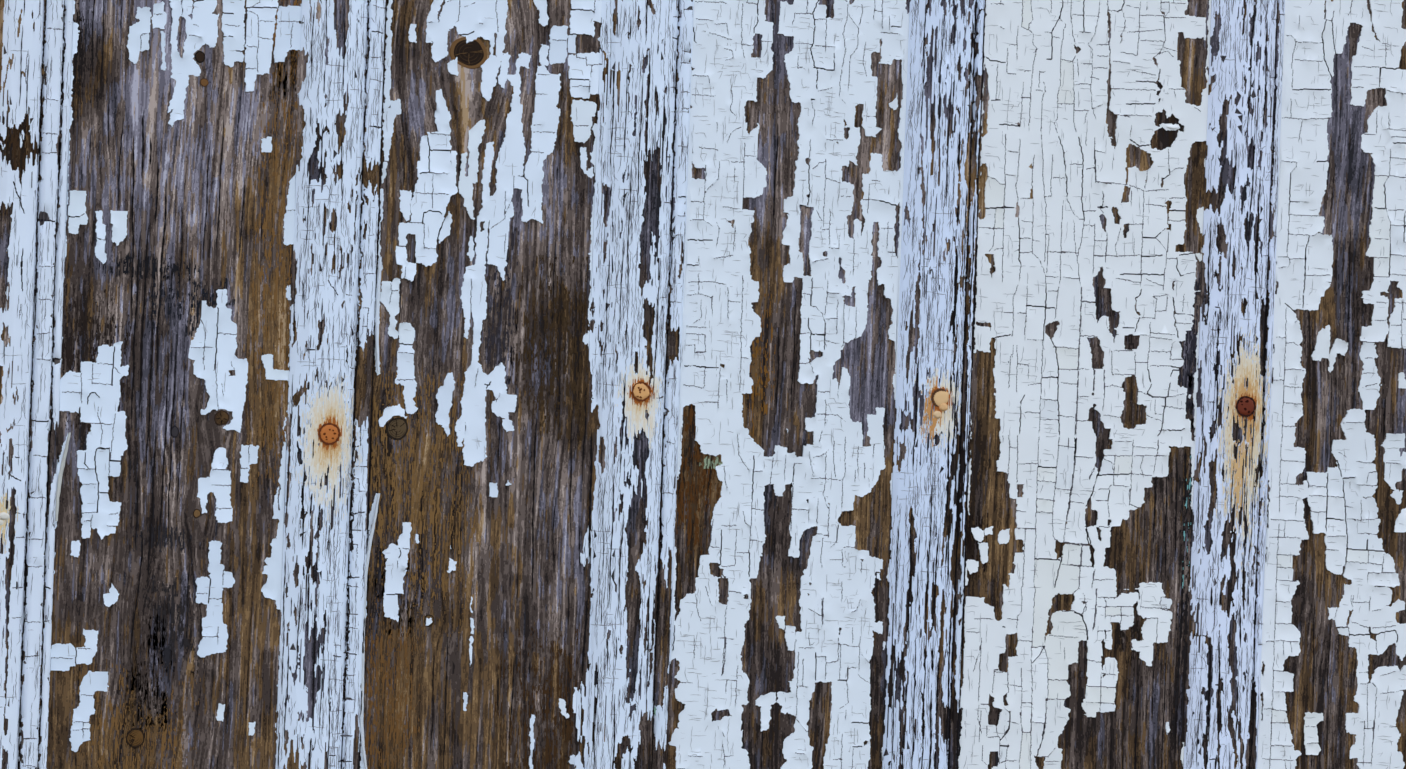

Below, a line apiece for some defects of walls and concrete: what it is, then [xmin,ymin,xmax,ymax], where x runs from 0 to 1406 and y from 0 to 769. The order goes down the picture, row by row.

corrosion [293,370,363,534]
peeling [0,0,832,769]
corrosion [615,358,664,449]
crack [468,0,1406,769]
corrosion [912,368,962,457]
corrosion [1216,324,1270,572]